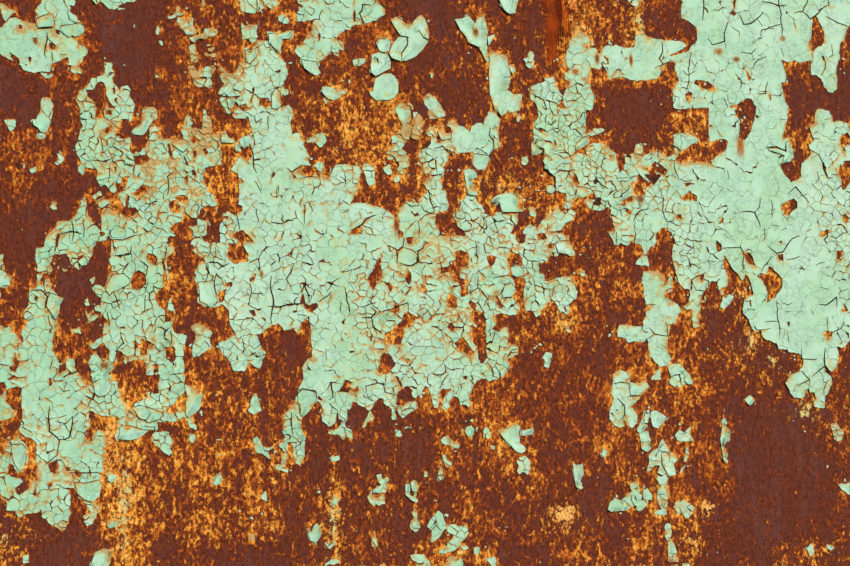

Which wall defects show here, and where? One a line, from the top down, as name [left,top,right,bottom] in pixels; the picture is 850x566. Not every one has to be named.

peeling [0,0,88,78]
crack [702,0,848,107]
peeling [0,6,578,531]
crack [249,247,409,333]
crack [352,191,516,310]
peeling [529,0,850,408]
crack [686,150,833,289]
corrosion [104,426,134,549]
corrosion [551,549,575,566]
corrosion [548,505,585,535]
peeling [608,369,694,515]
corrosion [699,499,715,524]